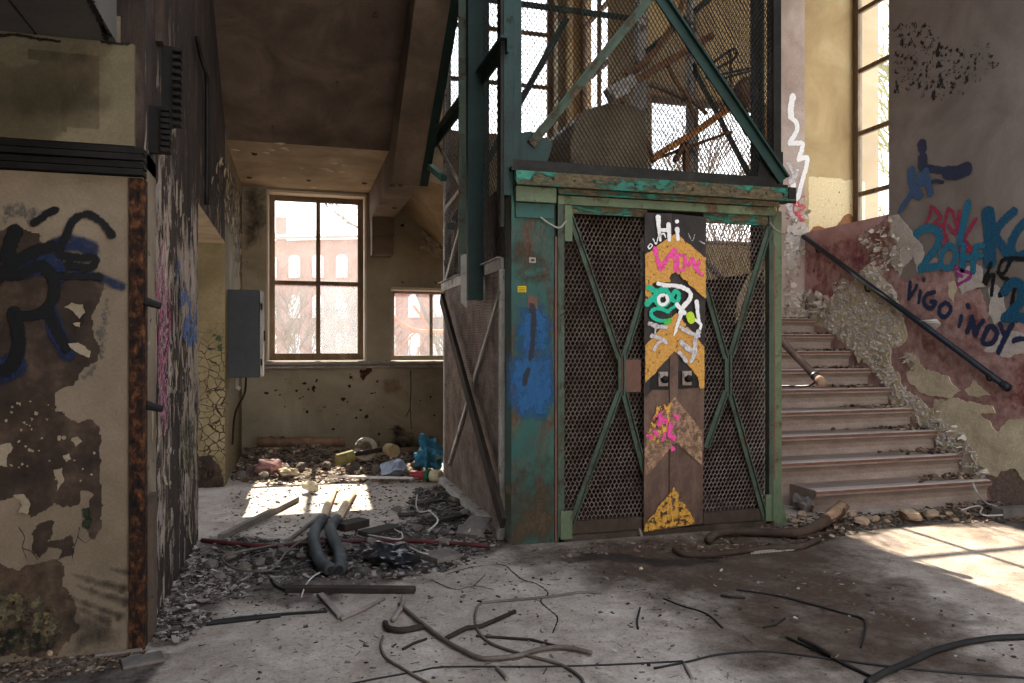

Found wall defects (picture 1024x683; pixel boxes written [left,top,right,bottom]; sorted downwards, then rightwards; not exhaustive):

flaking render [0,225,45,267]
flaking render [0,267,104,658]
rust [515,236,557,542]
flaking render [783,191,1024,505]